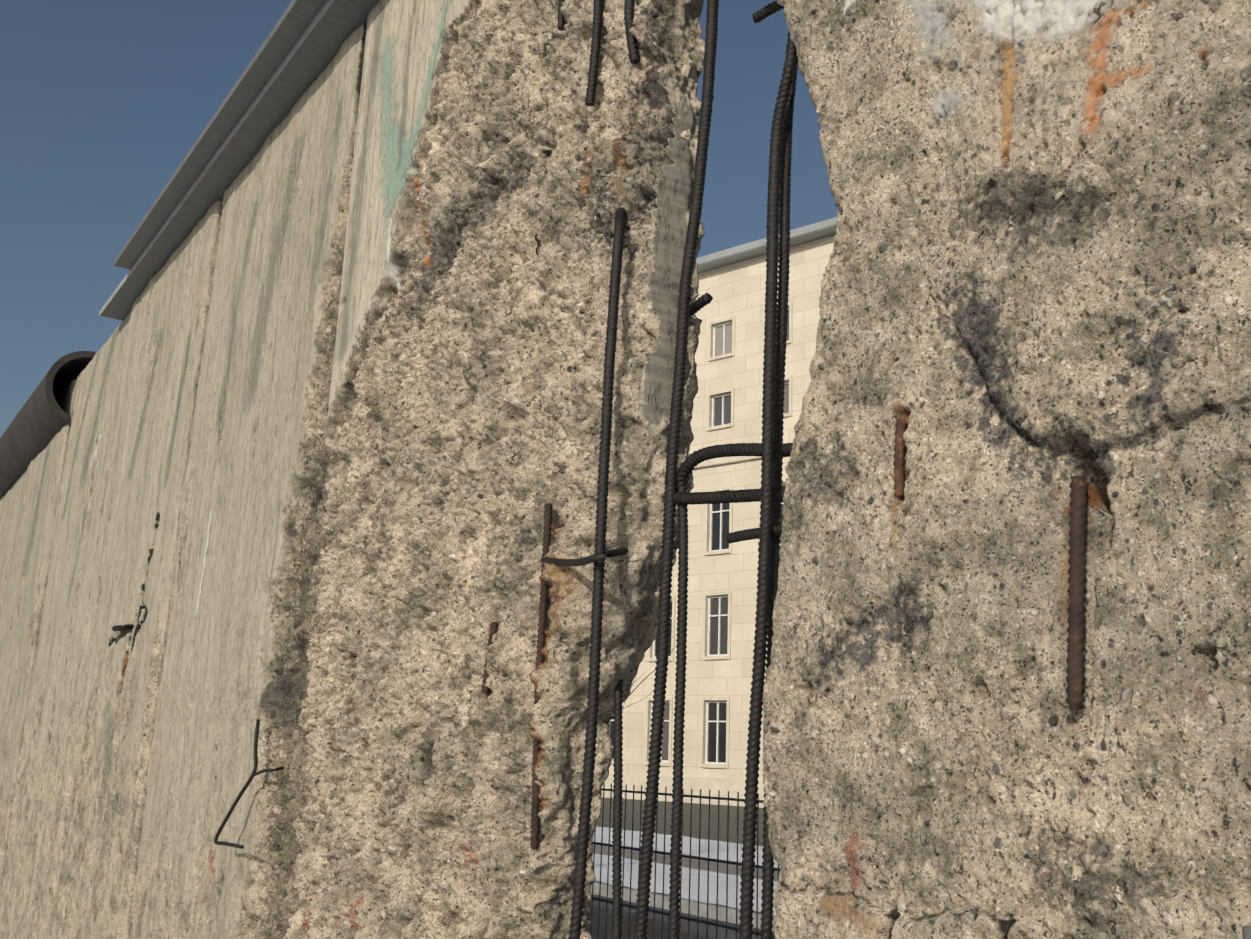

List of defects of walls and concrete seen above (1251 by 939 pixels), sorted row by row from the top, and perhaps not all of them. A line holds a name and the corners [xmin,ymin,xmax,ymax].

spalling [935,0,1148,262]
spalling [243,0,561,939]
spalling [535,0,858,939]
spalling [893,418,907,497]
spalling [924,270,1191,714]
corrosion [1085,453,1110,507]
corrosion [529,564,574,813]
spalling [798,577,934,694]
spalling [1032,836,1177,924]